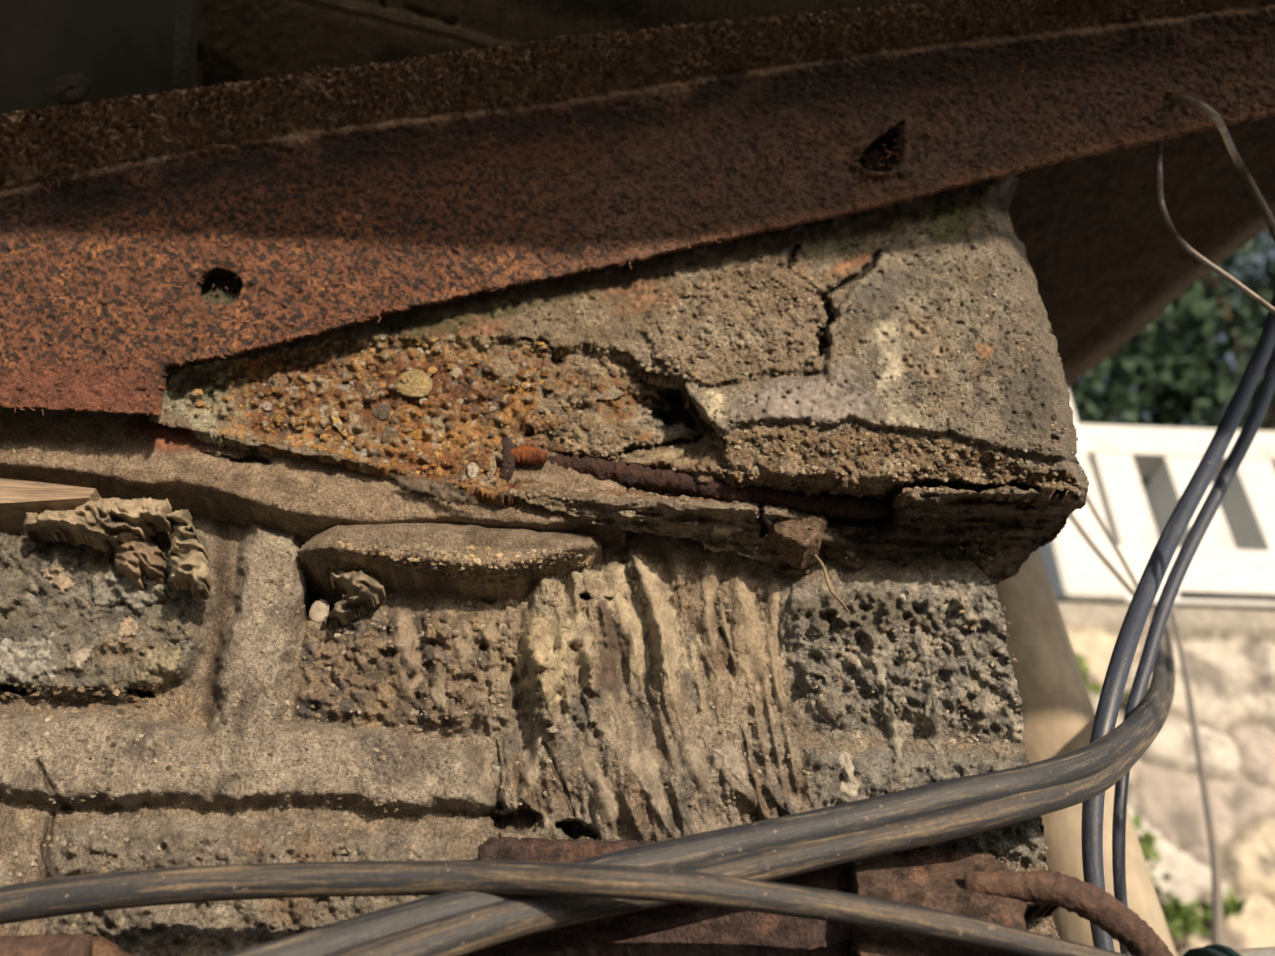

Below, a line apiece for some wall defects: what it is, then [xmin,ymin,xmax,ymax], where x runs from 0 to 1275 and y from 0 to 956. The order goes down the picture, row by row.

crack [787,245,800,269]
rust [831,253,873,275]
rust [584,278,677,315]
crack [817,251,882,356]
spalling [162,252,1086,570]
crack [887,478,1079,502]
peeling [40,564,181,687]
peeling [0,632,93,686]
crack [37,763,69,880]